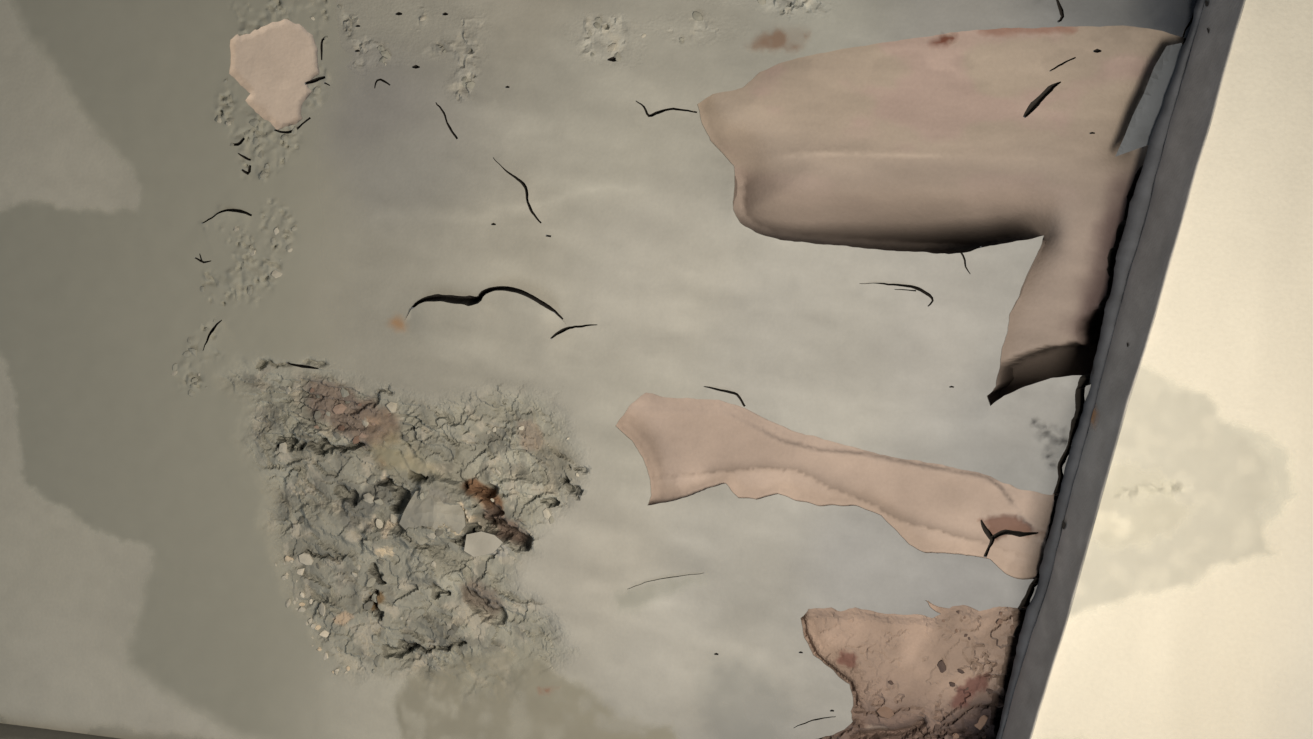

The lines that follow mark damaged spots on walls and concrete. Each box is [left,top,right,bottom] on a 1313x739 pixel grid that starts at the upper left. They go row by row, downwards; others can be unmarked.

peeling [229,19,319,130]
damp [0,0,336,739]
crack [412,286,597,338]
crack [860,283,934,306]
spalling [693,26,1185,405]
crack [1099,165,1143,311]
spalling [222,354,593,712]
spalling [616,393,1065,584]
crack [980,373,1091,737]
damp [1069,367,1292,616]
damp [395,647,676,739]
spalling [799,600,1028,739]